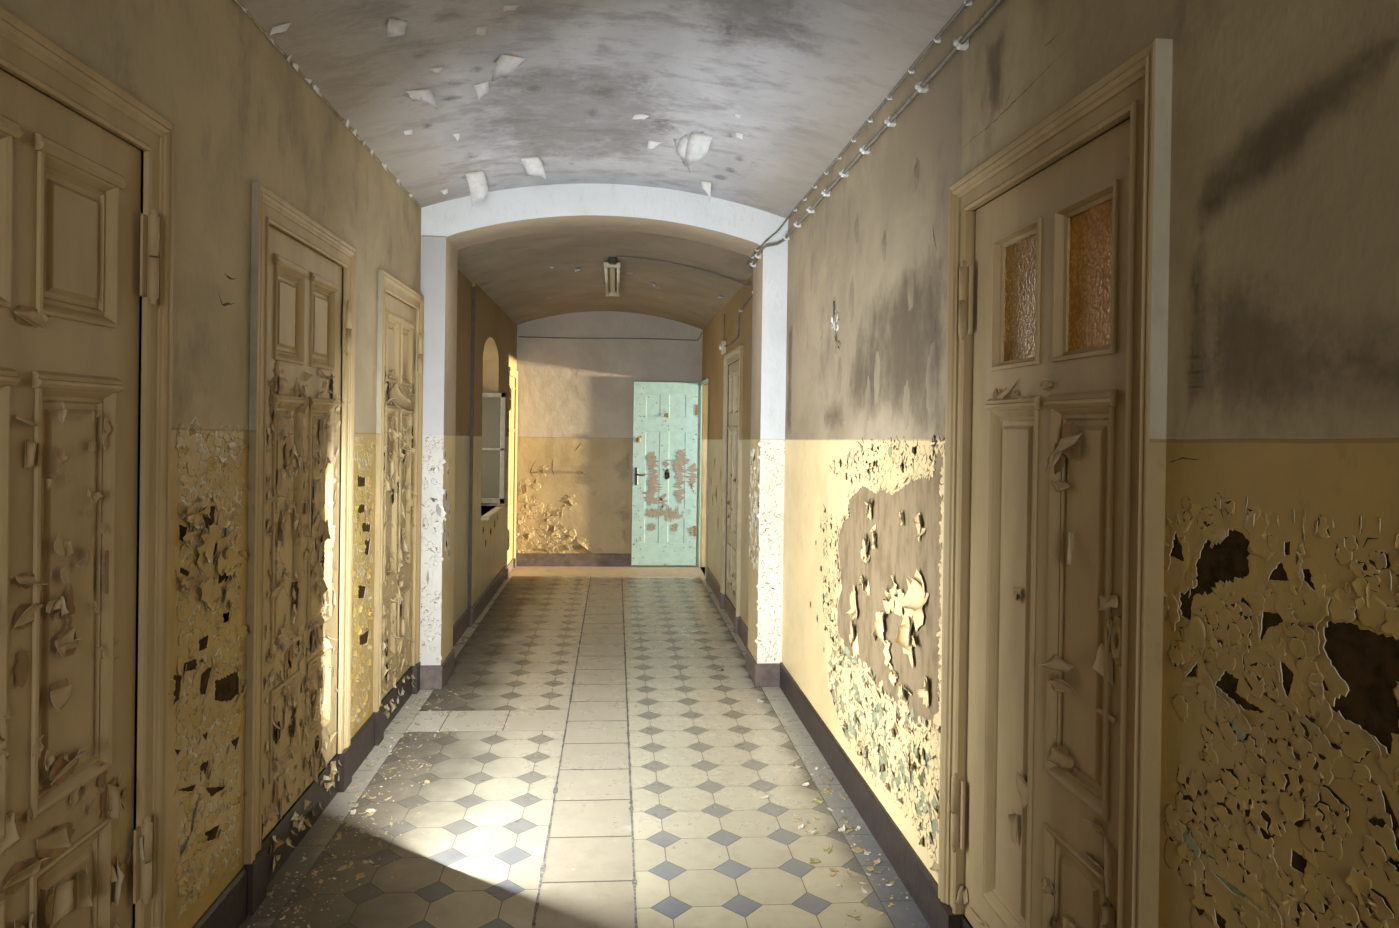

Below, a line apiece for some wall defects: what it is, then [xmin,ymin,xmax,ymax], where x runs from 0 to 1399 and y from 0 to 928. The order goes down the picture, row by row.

peeling [403,89,438,110]
peeling [472,53,526,99]
peeling [462,170,489,206]
peeling [517,156,546,179]
peeling [647,131,714,202]
damp [855,290,933,396]
peeling [516,465,602,554]
peeling [354,472,373,658]
peeling [809,433,945,825]
peeling [1163,495,1399,789]
peeling [381,675,416,719]
peeling [1283,838,1320,892]